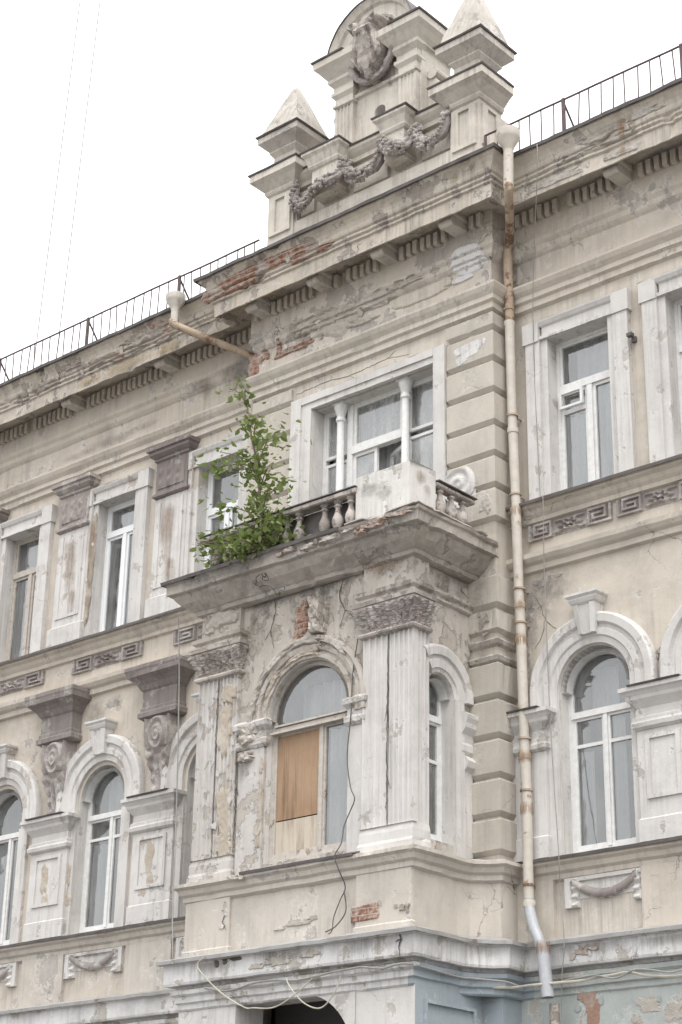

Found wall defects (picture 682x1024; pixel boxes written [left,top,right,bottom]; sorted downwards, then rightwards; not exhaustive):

flaking render [248,274,424,377]
peeling [453,337,486,367]
peeling [211,599,348,858]
crack [382,635,390,819]
peeling [40,864,49,903]
flaking render [350,900,381,924]
peeling [574,992,603,1024]